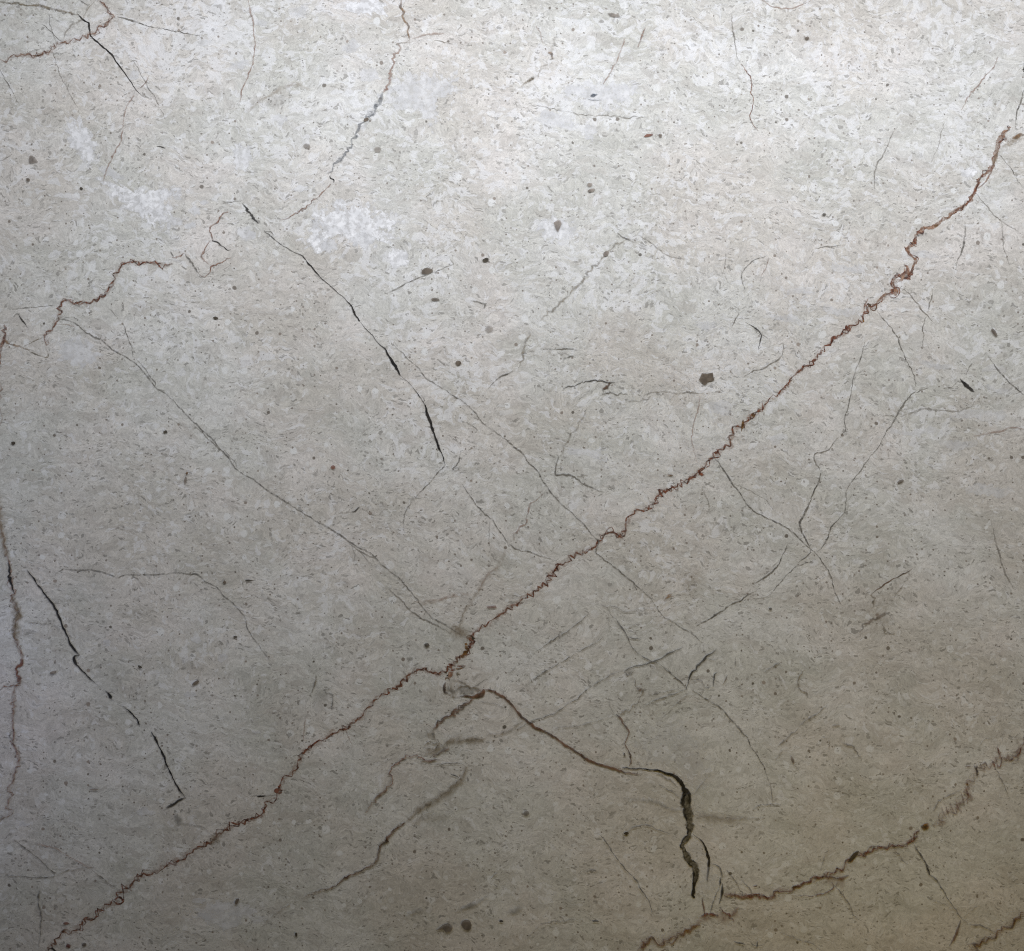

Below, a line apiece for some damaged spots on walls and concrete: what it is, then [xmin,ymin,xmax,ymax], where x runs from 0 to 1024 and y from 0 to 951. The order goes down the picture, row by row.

crack [4,1,189,168]
crack [0,201,257,393]
crack [176,126,1021,863]
crack [0,524,186,817]
crack [61,569,261,648]
crack [47,864,168,950]
crack [318,824,403,891]
crack [484,606,1020,948]